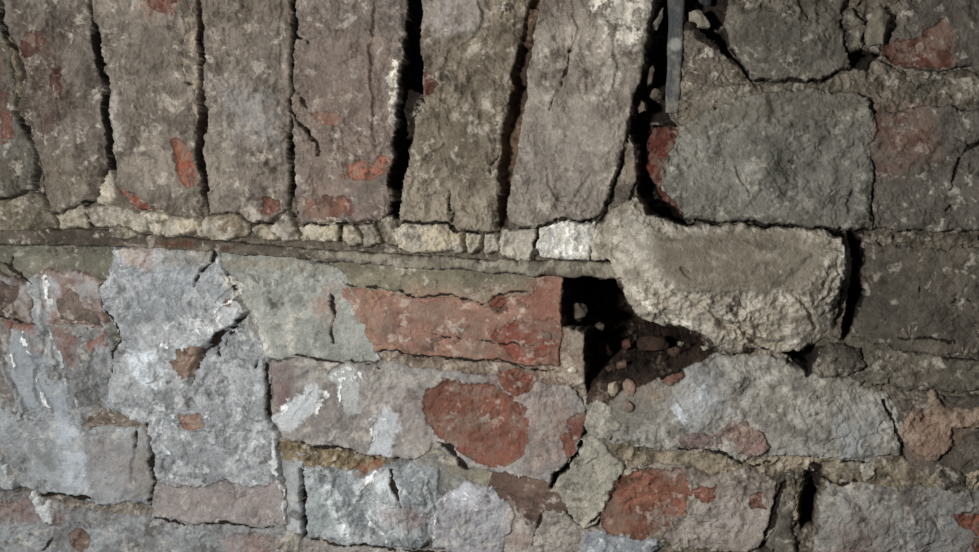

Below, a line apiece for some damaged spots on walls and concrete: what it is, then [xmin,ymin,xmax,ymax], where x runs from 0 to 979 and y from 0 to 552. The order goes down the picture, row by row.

crack [222,0,629,253]
crack [295,284,555,372]
spalling [360,276,718,552]